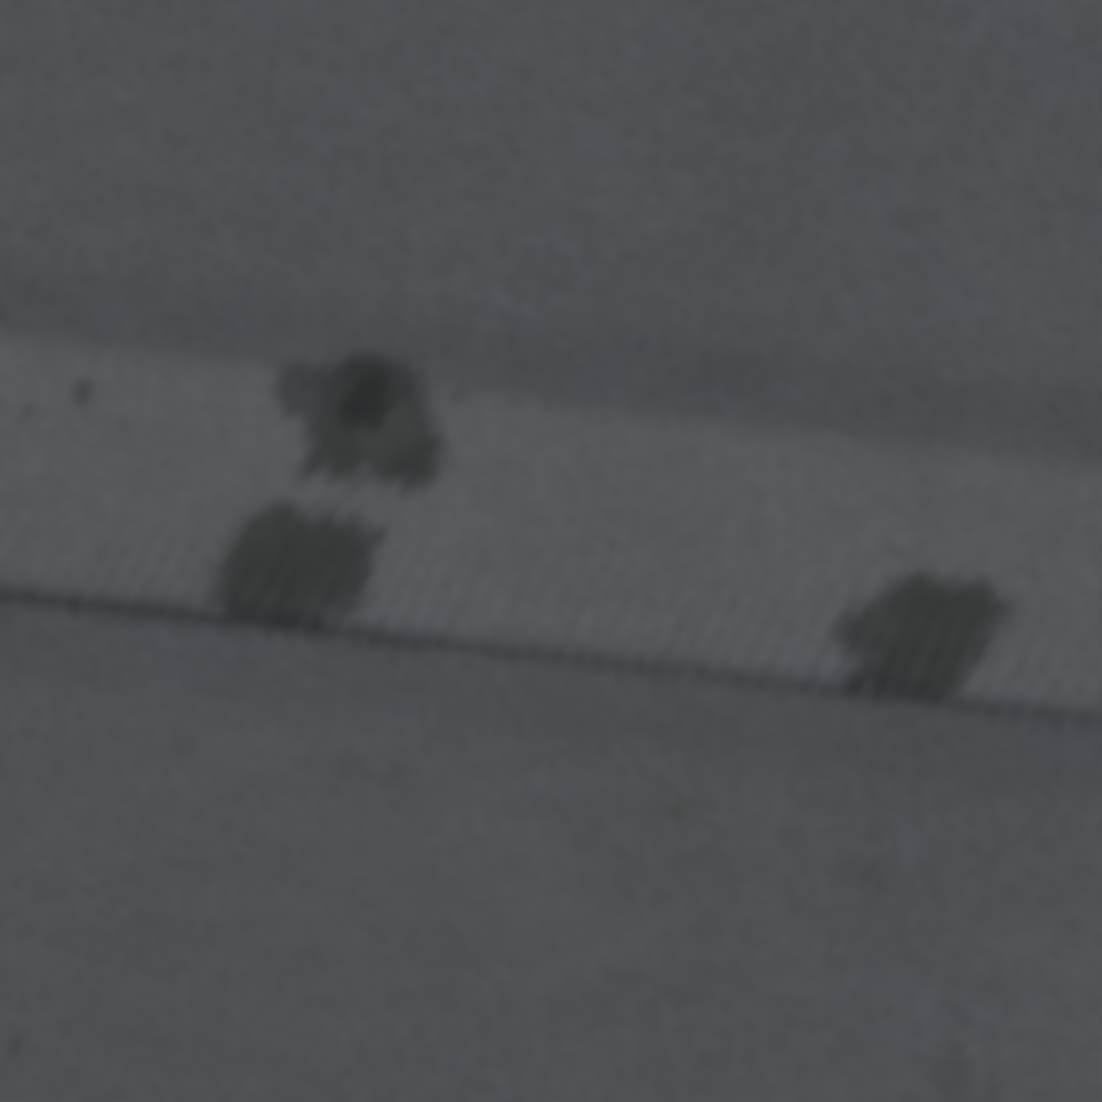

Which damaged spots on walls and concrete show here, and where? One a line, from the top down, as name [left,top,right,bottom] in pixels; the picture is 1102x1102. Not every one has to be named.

water stain [283,358,438,483]
water stain [225,506,379,624]
water stain [842,576,1002,692]